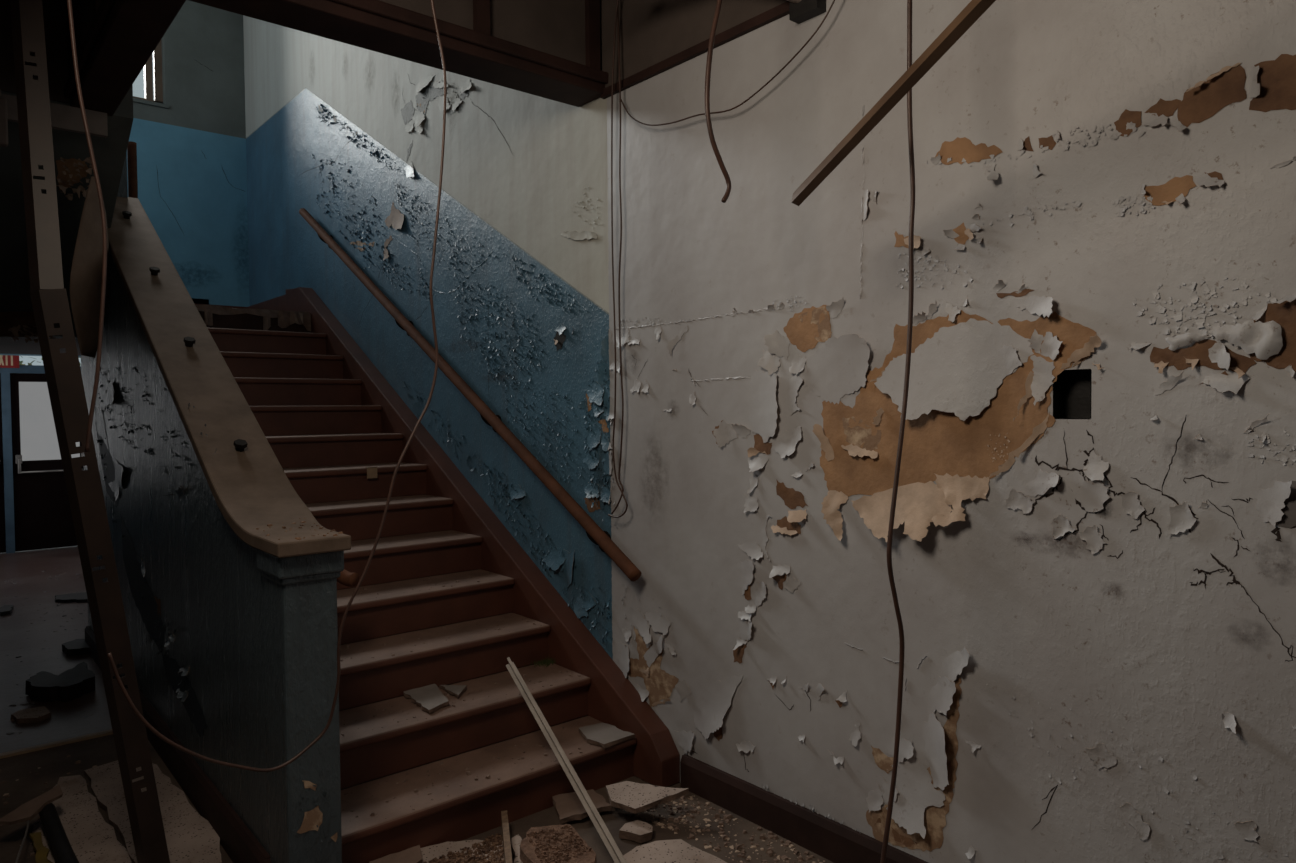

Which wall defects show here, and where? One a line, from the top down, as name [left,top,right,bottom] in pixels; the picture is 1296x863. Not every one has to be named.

peeling [925,54,1296,180]
peeling [1111,171,1225,216]
peeling [297,73,649,529]
peeling [1128,277,1296,395]
peeling [400,200,1105,772]
crack [1005,417,1296,661]
peeling [761,647,981,852]